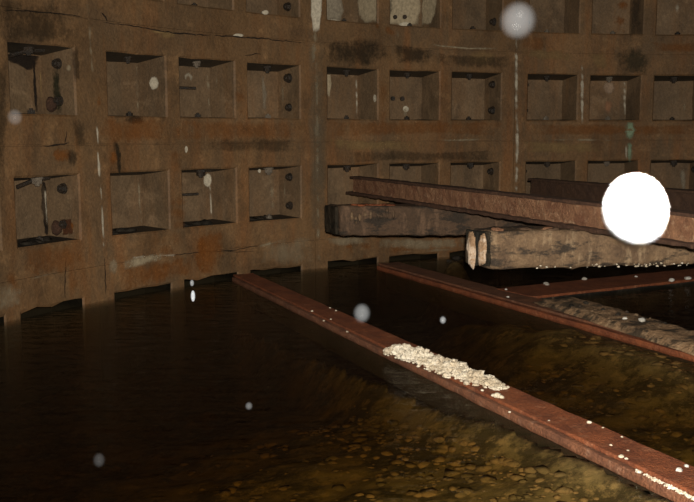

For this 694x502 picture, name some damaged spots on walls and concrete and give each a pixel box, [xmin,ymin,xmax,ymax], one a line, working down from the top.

crack [6,9,80,17]
crack [102,13,301,56]
leakage [311,0,322,39]